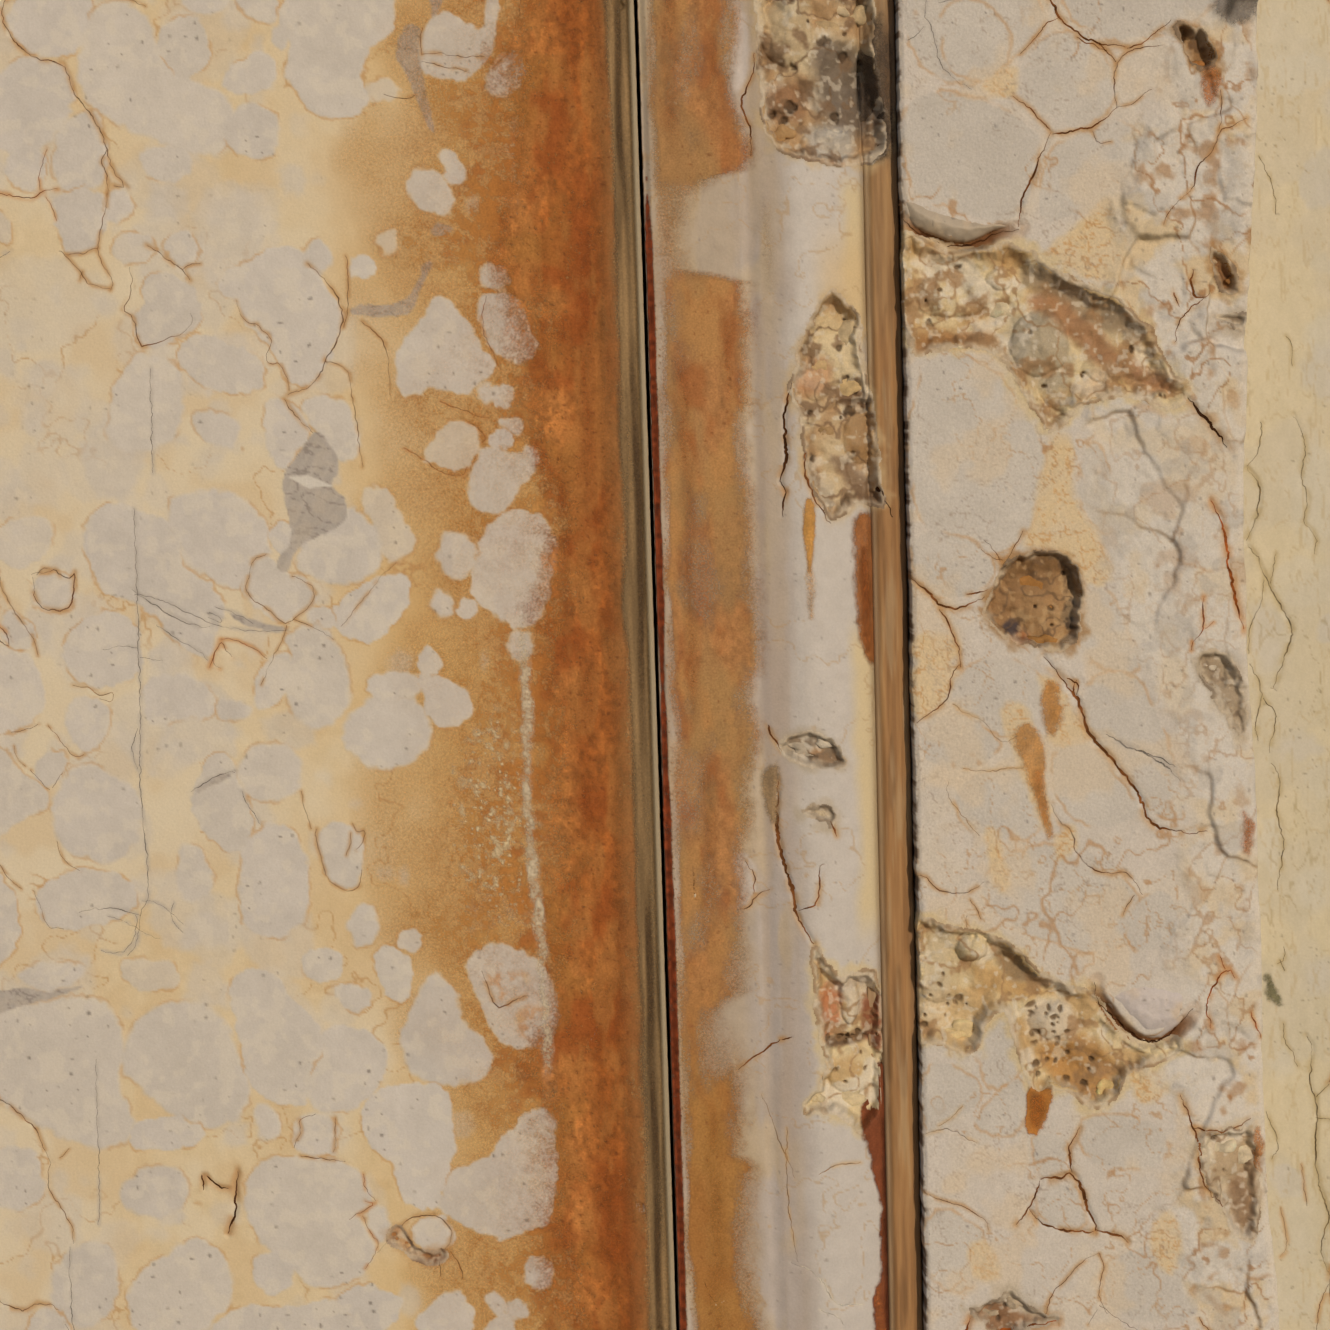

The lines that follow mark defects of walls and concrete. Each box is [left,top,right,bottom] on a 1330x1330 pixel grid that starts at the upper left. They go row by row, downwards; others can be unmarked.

spalling [753,0,889,167]
spalling [899,230,1193,433]
rust [396,0,650,1330]
rust [645,0,761,1330]
crack [738,725,837,944]
rust [853,513,874,663]
crack [1043,656,1203,834]
crack [1188,398,1293,890]
spalling [802,946,883,1136]
spalling [914,912,1185,1110]
rust [861,1062,889,1330]
crack [924,1127,1137,1330]